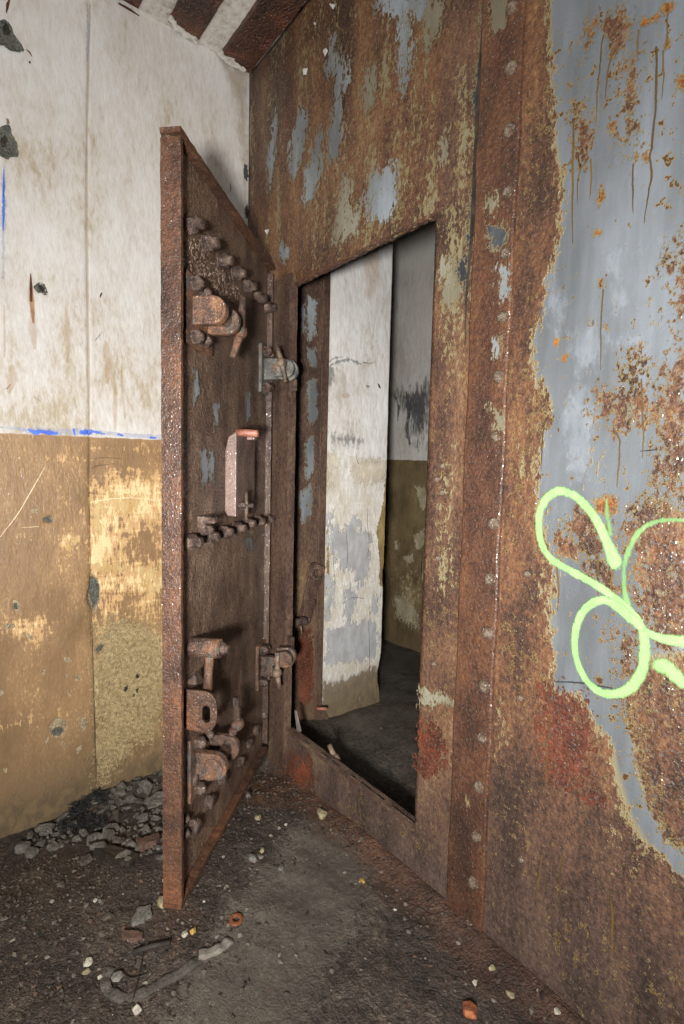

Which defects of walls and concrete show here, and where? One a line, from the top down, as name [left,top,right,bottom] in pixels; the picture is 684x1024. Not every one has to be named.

corrosion [564,0,684,243]
corrosion [184,238,241,304]
corrosion [526,391,560,468]
peeling [64,488,149,557]
peeling [323,449,426,666]
corrosion [295,626,315,708]
corrosion [412,684,454,780]
corrosion [533,677,610,812]